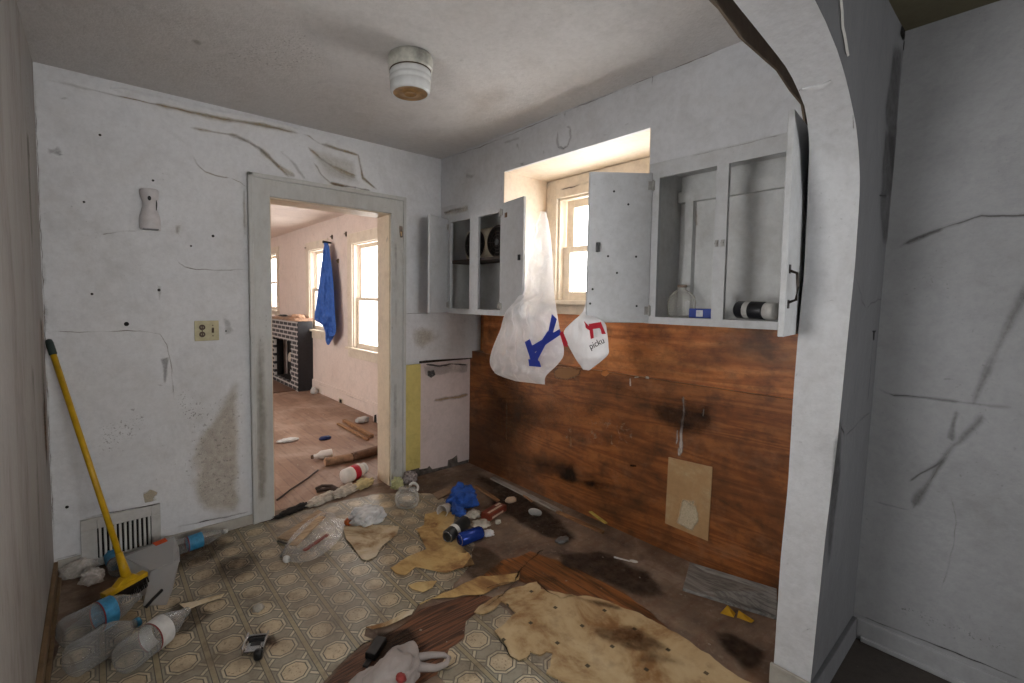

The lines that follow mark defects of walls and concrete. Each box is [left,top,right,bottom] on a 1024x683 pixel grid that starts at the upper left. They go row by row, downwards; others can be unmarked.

crack [99,78,372,186]
crack [907,214,1024,243]
crack [911,461,942,504]